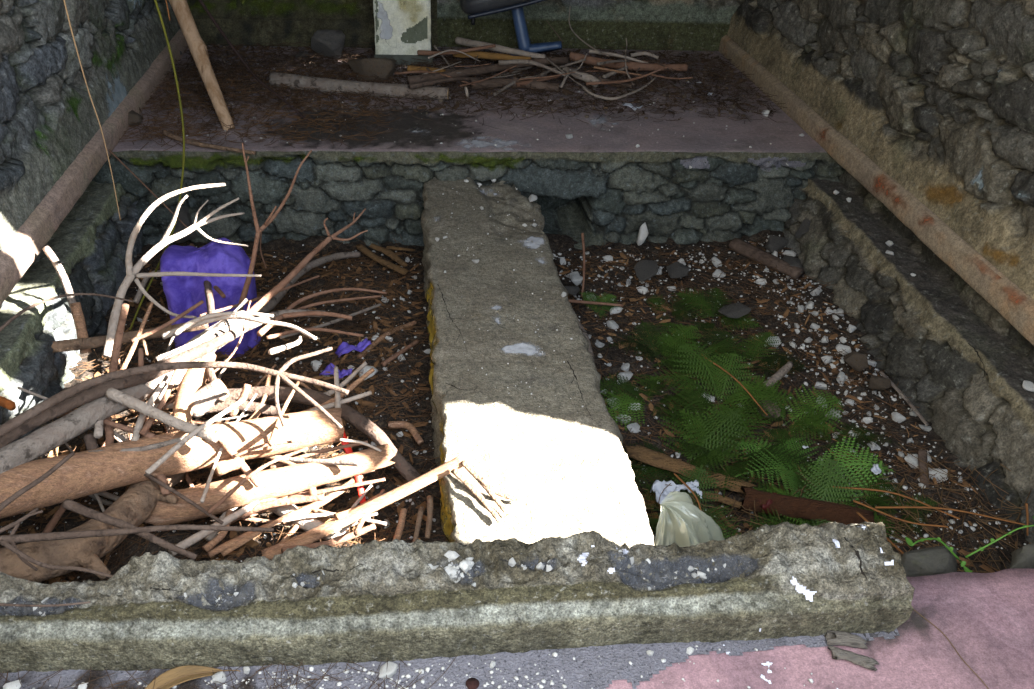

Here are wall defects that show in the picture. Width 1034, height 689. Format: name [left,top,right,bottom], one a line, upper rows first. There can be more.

flaking render [375,0,428,43]